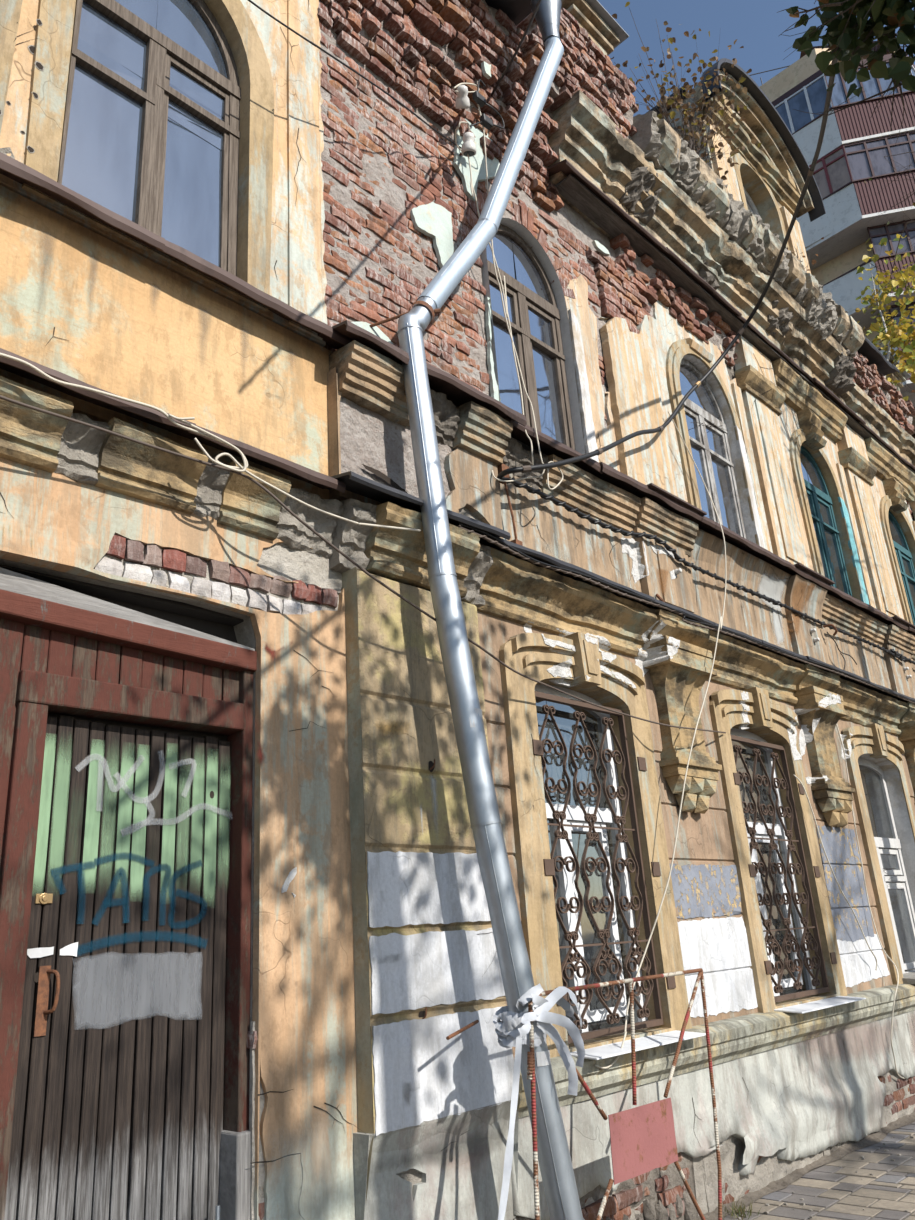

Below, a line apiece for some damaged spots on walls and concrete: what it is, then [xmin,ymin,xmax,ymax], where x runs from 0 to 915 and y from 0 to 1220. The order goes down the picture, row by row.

flaking render [319,29,495,348]
flaking render [423,256,491,397]
flaking render [502,185,654,396]
flaking render [93,535,342,615]
flaking render [247,1021,265,1220]
flaking render [396,1169,422,1188]
flaking render [579,1136,854,1220]
flaking render [870,1070,915,1134]